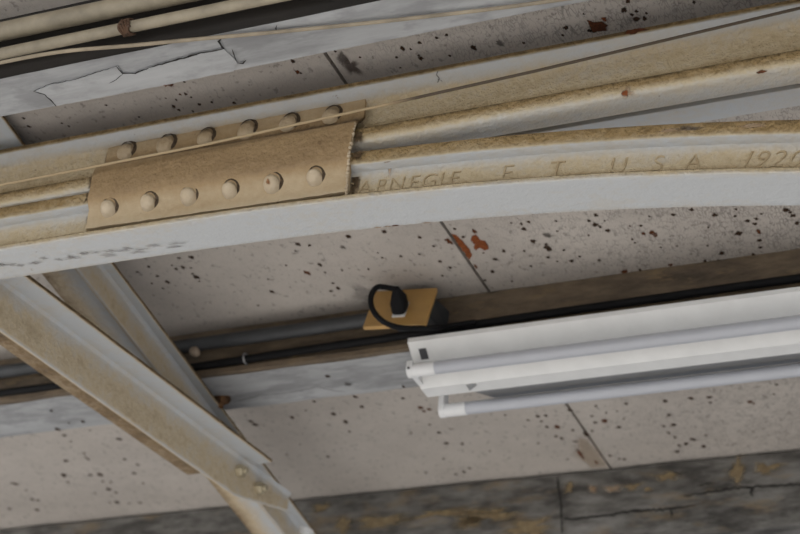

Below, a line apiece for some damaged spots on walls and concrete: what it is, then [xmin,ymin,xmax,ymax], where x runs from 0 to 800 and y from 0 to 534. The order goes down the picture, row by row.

rust [587,17,608,33]
peeling [36,48,238,112]
rust [445,229,489,269]